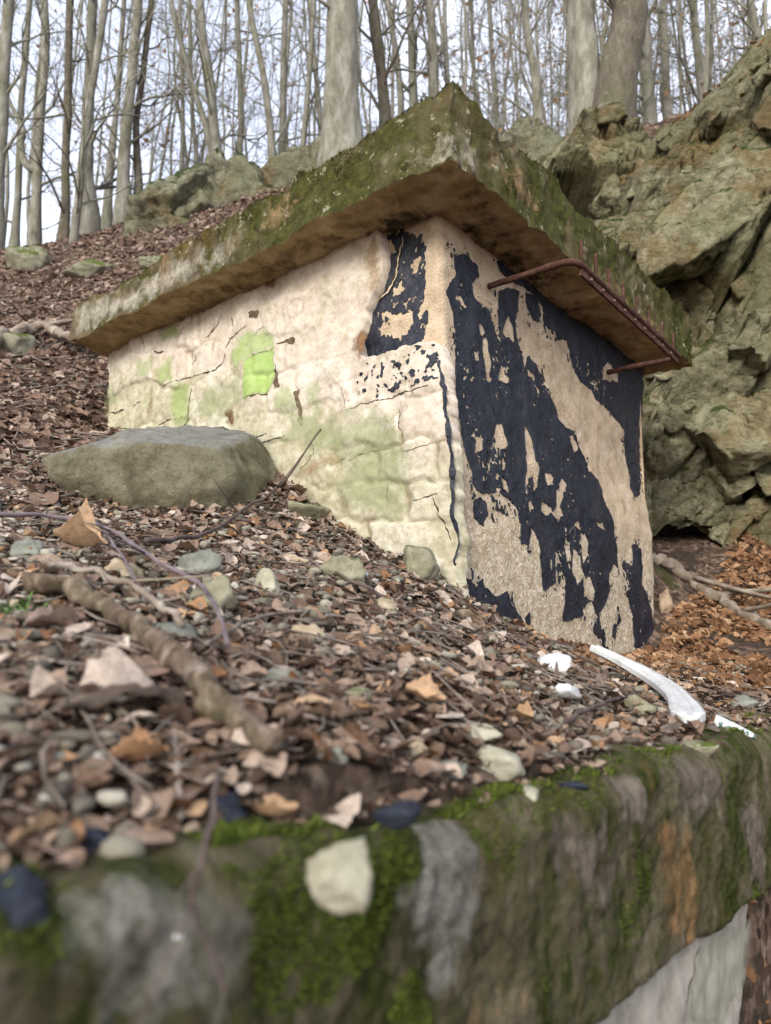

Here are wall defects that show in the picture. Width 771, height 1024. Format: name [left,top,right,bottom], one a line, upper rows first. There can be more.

crack [109,314,295,429]
damp [202,332,275,416]
crack [300,360,460,565]
peeling [348,229,655,650]